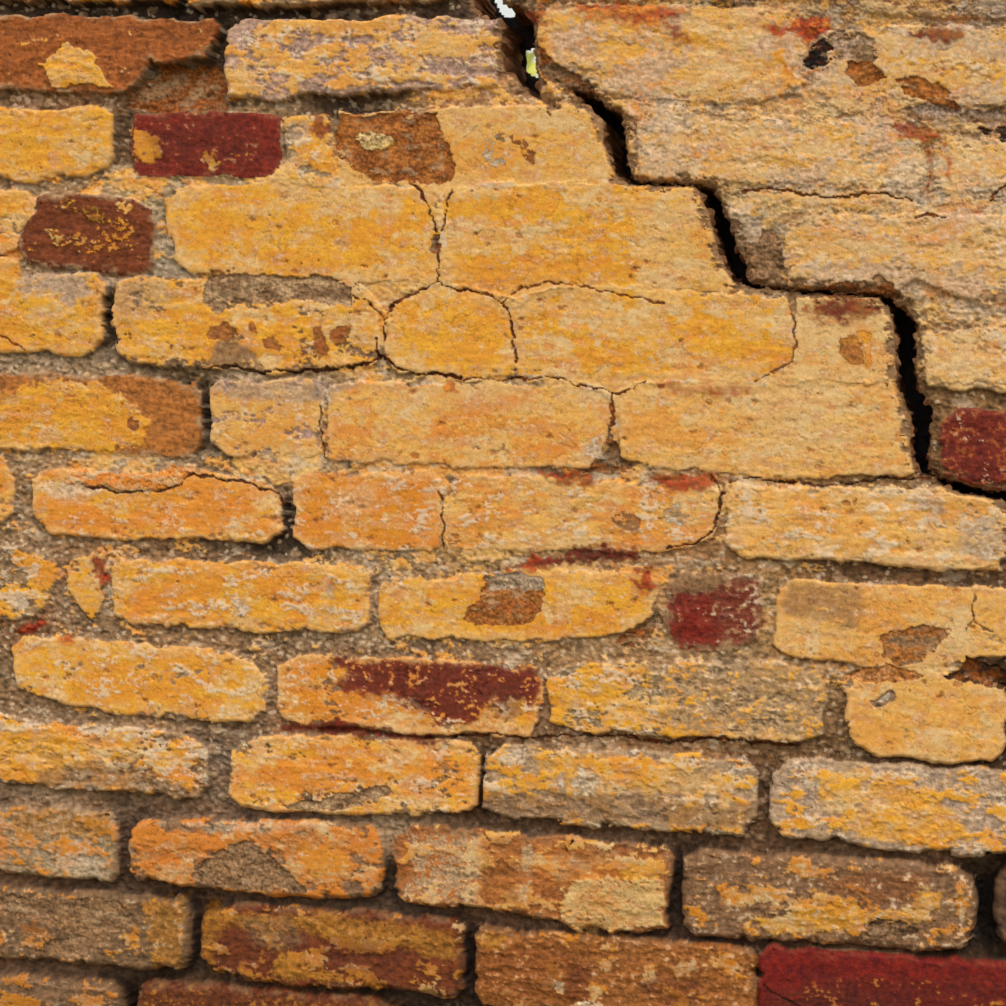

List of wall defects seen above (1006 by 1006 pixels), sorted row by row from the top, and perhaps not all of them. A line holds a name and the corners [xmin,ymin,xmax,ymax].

crack [474,0,1006,549]
spalling [463,569,545,626]